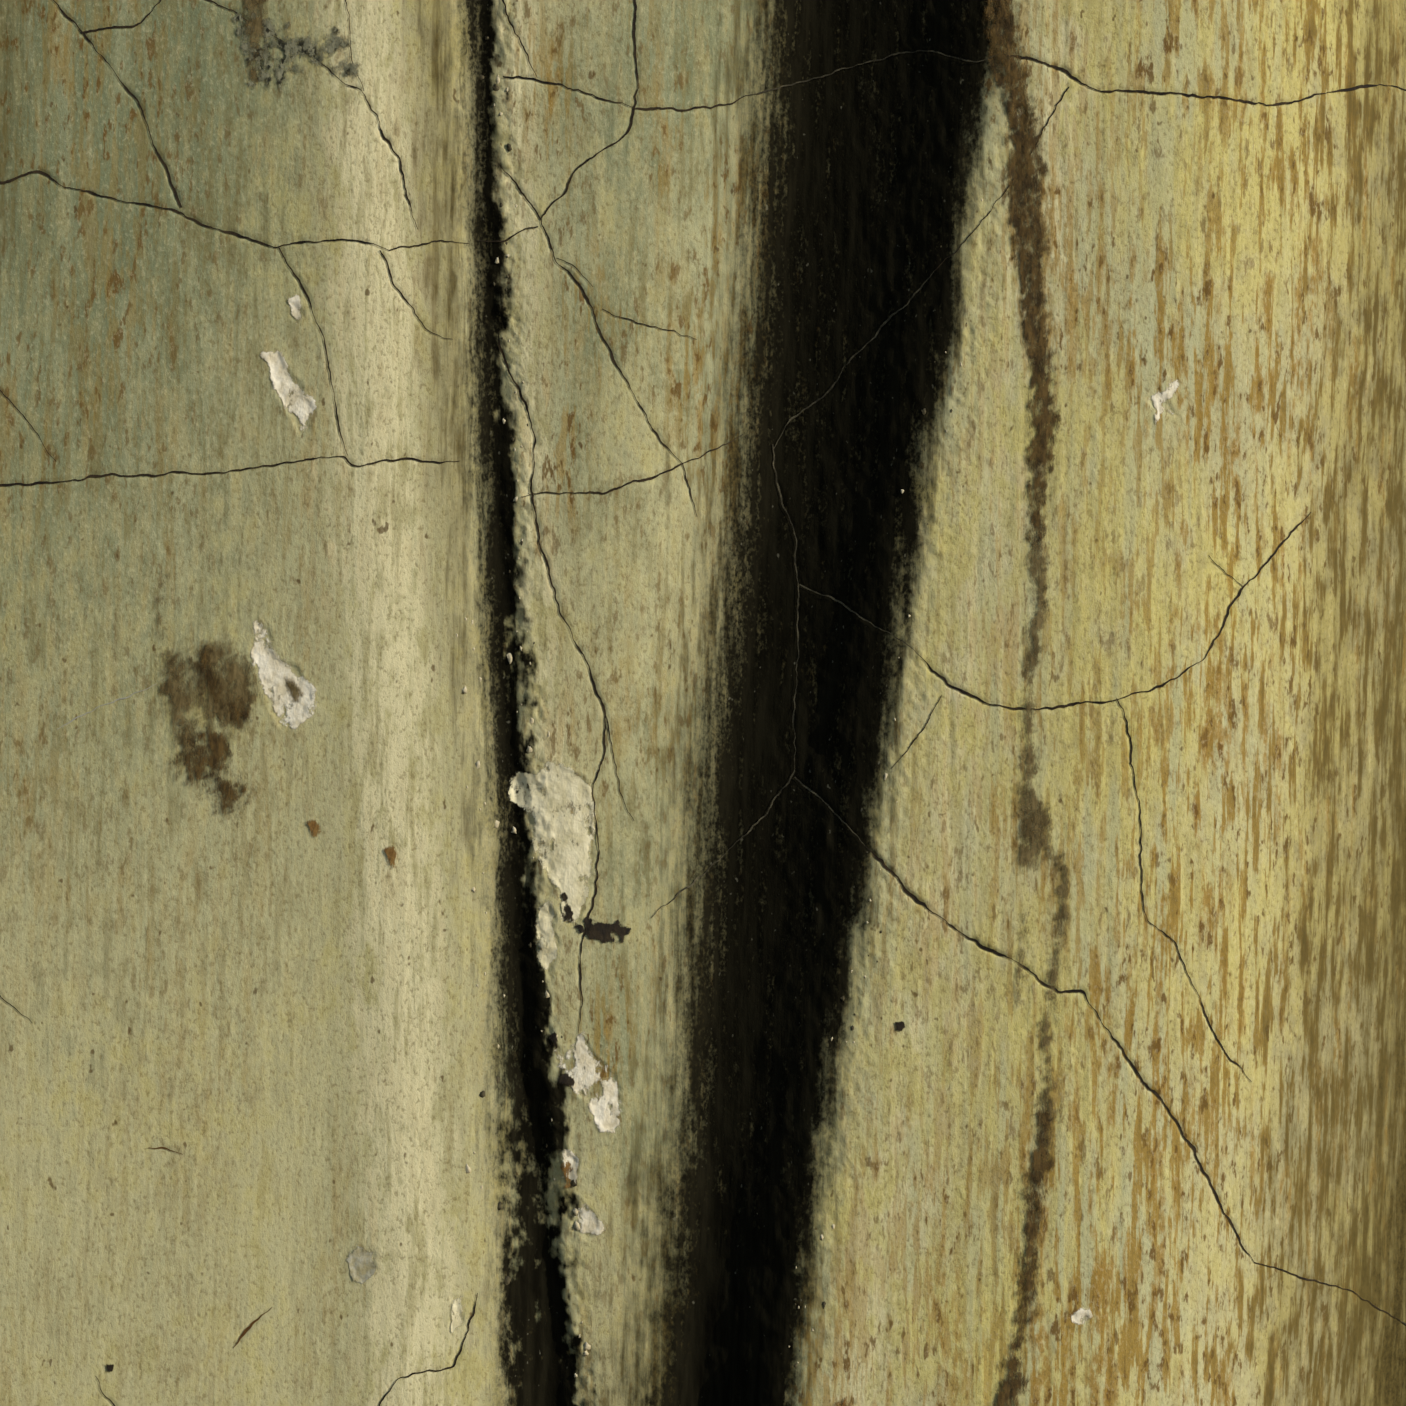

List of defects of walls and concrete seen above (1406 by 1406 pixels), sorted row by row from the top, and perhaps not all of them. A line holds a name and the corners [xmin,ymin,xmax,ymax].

damp [233,0,358,90]
spalling [288,295,301,320]
spalling [260,351,317,431]
crack [0,0,1406,1032]
damp [160,641,257,813]
spalling [251,620,317,729]
crack [651,180,1406,1325]
peeling [494,761,631,998]
peeling [541,1030,620,1133]
peeling [546,1144,579,1187]
crack [379,1293,478,1406]
peeling [451,1297,463,1333]